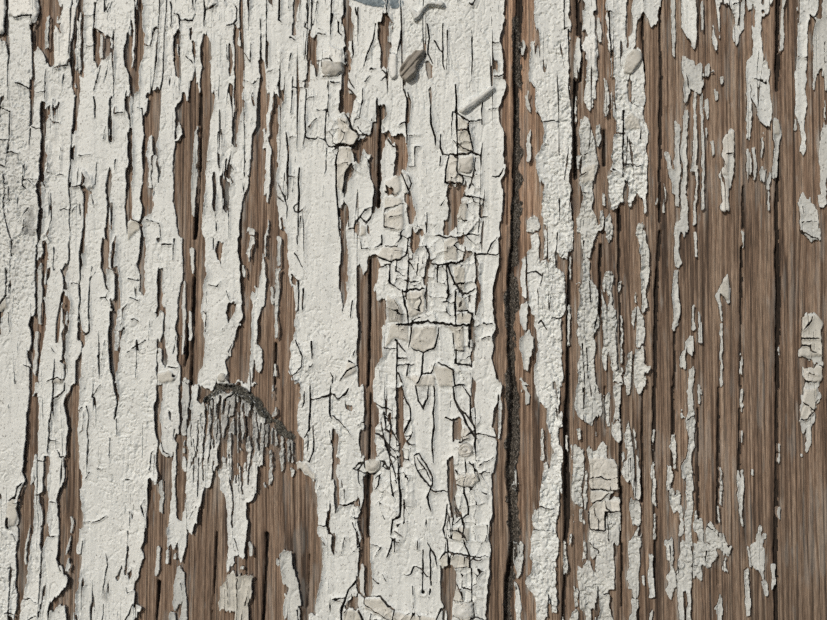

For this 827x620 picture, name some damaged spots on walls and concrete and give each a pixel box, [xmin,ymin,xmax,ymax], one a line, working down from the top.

crack [171,0,207,26]
crack [0,83,84,210]
crack [163,94,223,249]
peeling [0,0,85,620]
peeling [102,169,125,387]
crack [72,258,162,352]
crack [169,277,218,385]
peeling [125,0,343,620]
peeling [443,182,481,363]
crack [229,0,744,620]
peeling [458,0,661,620]
peeling [799,315,823,422]